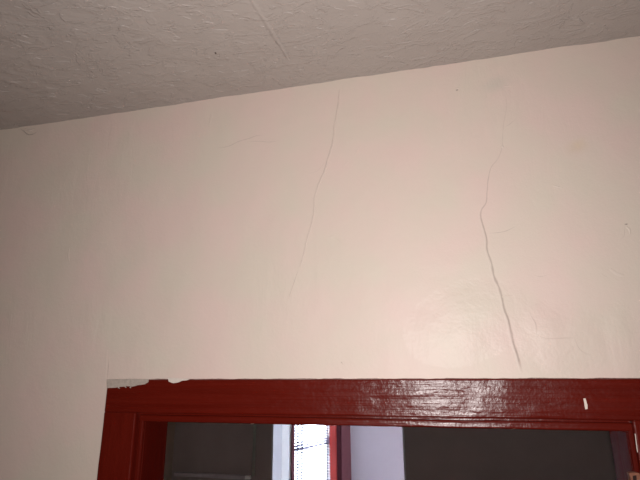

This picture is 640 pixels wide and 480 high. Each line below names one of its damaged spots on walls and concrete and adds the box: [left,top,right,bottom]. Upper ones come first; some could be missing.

crack [478,92,523,373]
peeling [106,379,149,389]